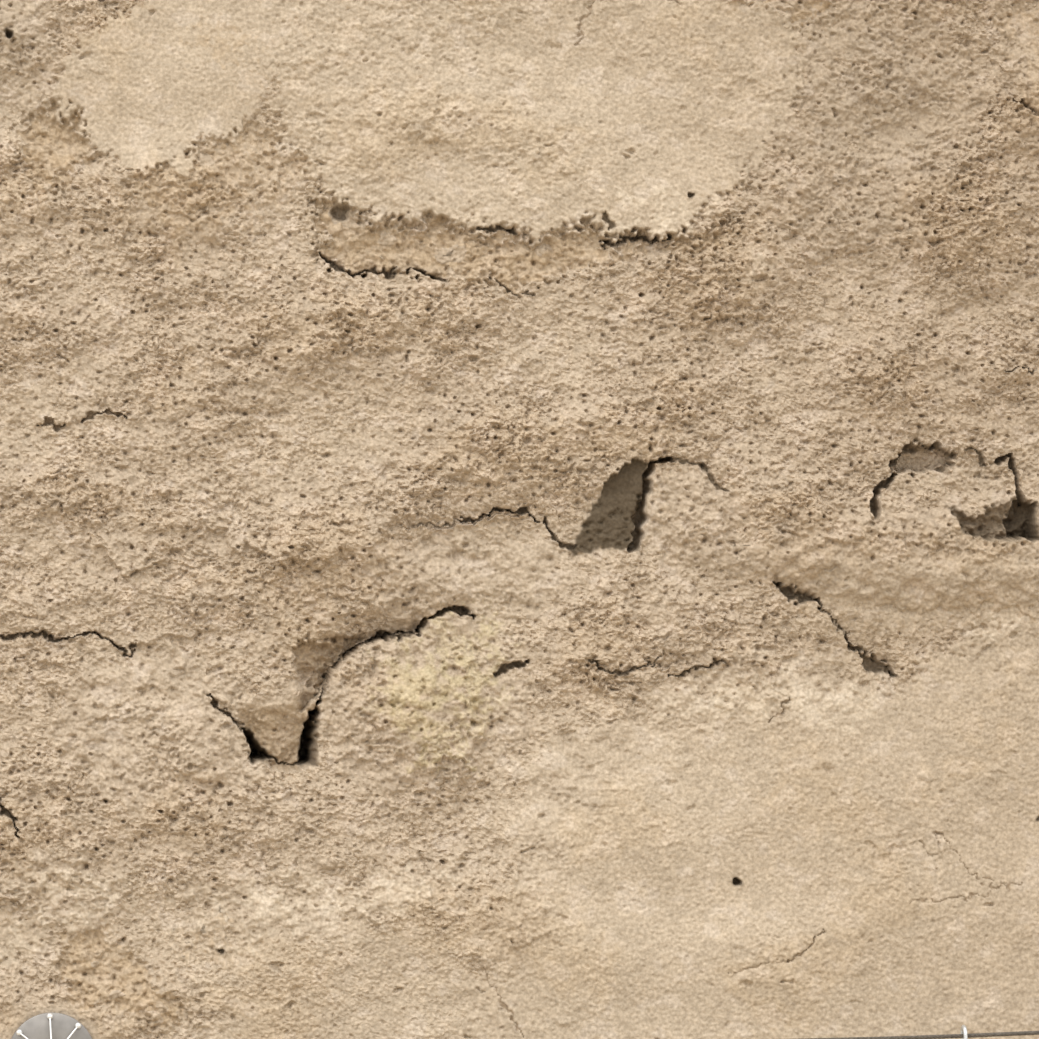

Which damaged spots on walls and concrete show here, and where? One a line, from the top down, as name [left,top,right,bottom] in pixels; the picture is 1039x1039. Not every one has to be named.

crack [475,224,519,235]
crack [599,211,672,249]
crack [318,251,450,285]
crack [489,275,536,297]
crack [1004,365,1038,375]
crack [407,506,540,529]
spalling [543,454,731,559]
crack [0,630,138,658]
crack [772,581,899,678]
crack [588,654,729,677]
crack [206,605,476,774]
crack [0,794,20,838]